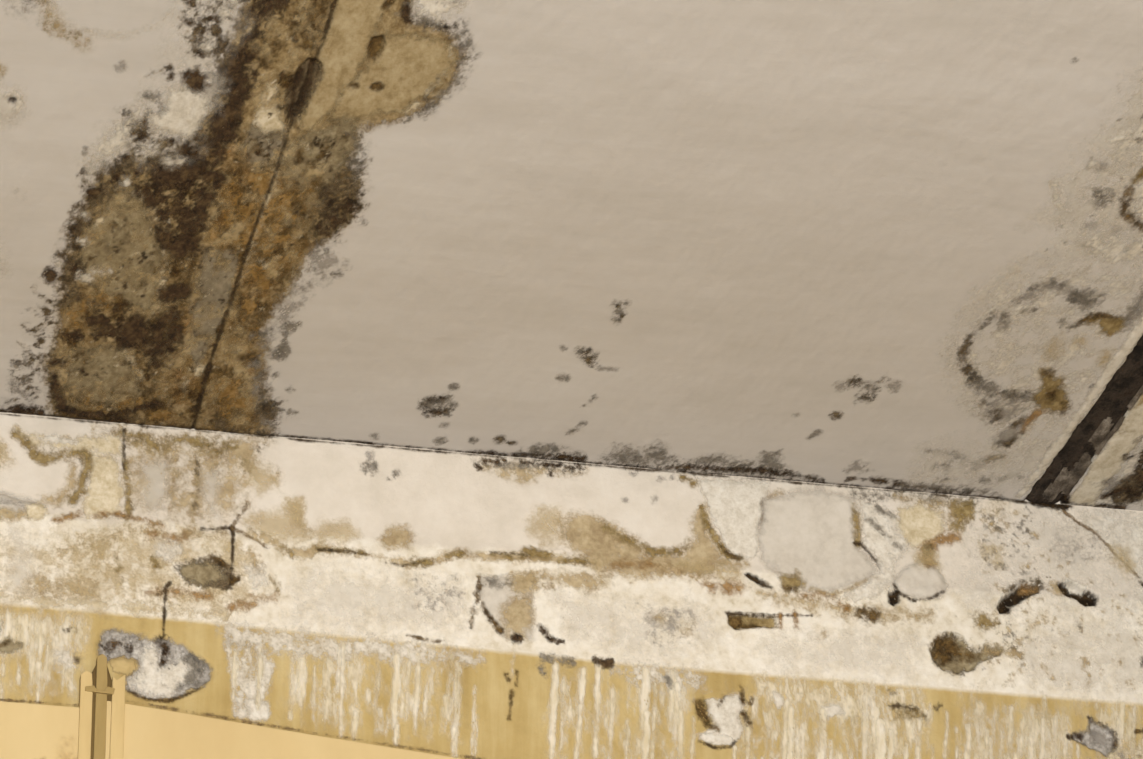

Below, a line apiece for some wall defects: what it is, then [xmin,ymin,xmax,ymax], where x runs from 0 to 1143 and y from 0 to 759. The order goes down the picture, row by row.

crack [0,0,1027,520]
leakage [0,0,485,757]
leakage [469,436,586,482]
leakage [836,313,1038,565]
leakage [381,506,747,590]
peeling [698,478,945,602]
spalling [974,578,1097,629]
spalling [98,629,210,703]
leakage [539,653,702,759]
spalling [696,693,752,749]
leakage [733,674,1079,759]
spalling [930,633,1022,674]